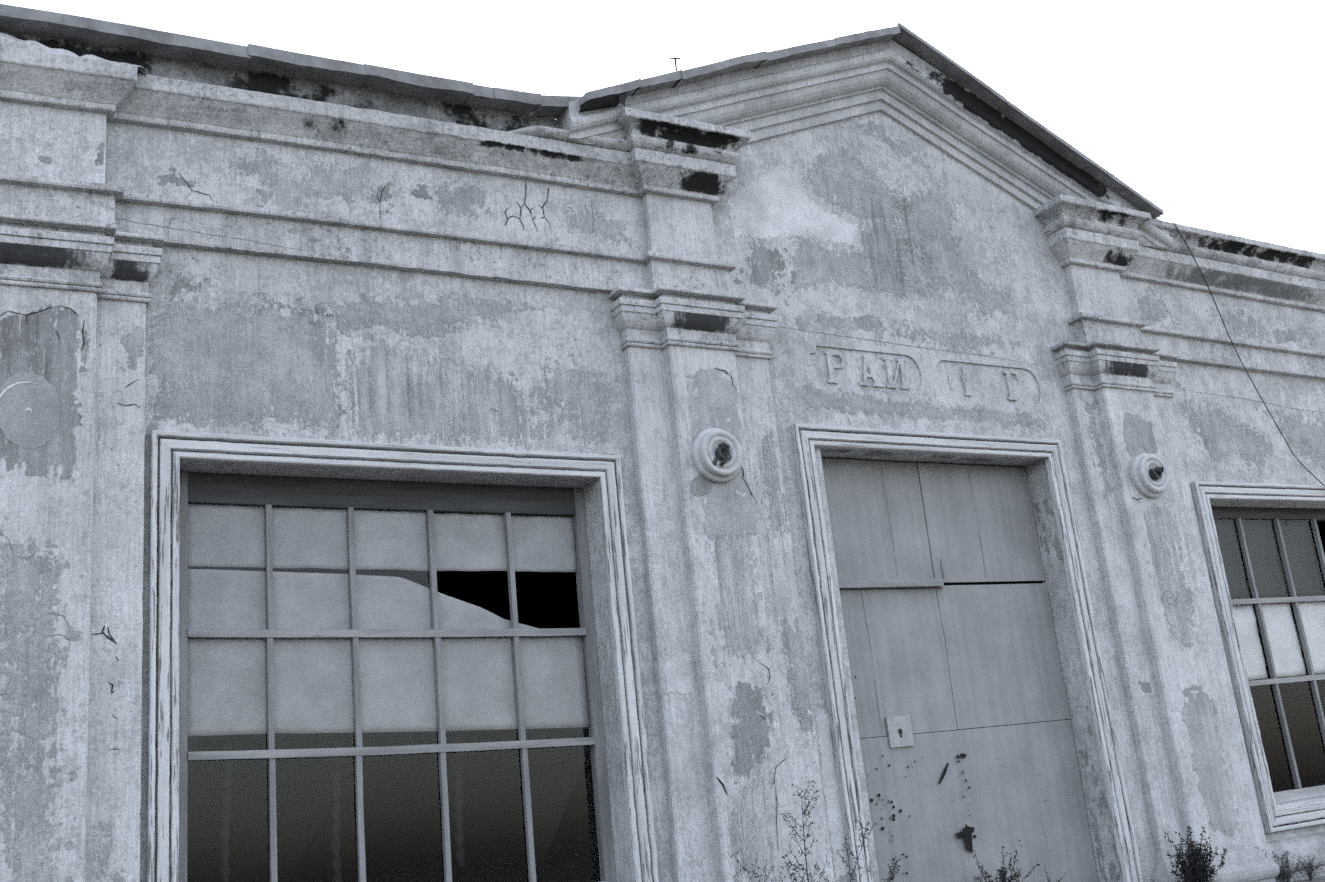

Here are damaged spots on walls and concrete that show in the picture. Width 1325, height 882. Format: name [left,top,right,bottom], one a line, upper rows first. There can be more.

crack [505,184,550,231]
flaking render [0,304,91,482]
flaking render [687,366,741,445]
peeling [691,429,816,882]
peeling [1182,685,1239,838]